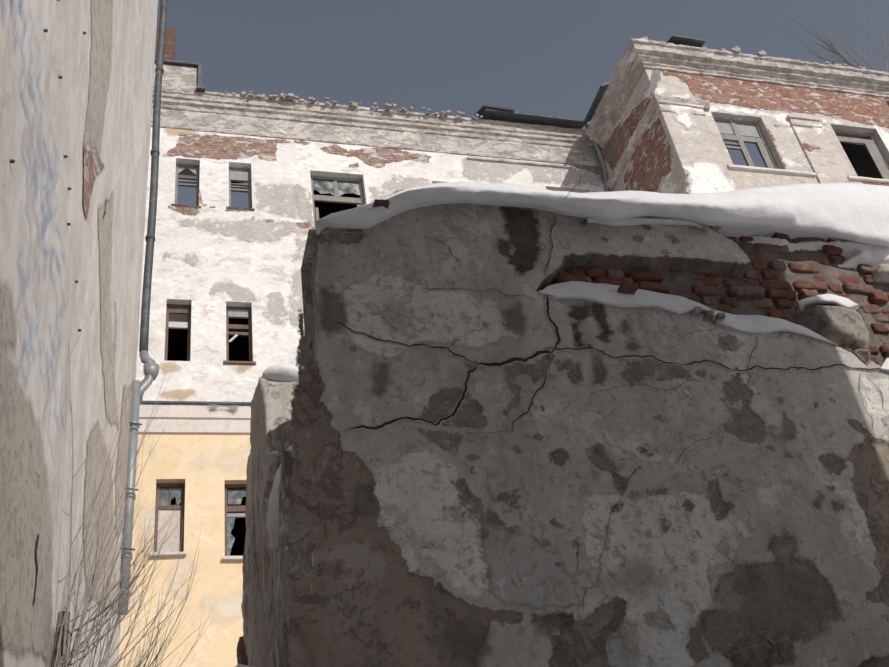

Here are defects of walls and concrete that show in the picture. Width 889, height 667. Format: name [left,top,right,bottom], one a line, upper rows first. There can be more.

spalling [162,133,310,161]
spalling [321,144,431,168]
spalling [463,69,889,194]
crack [542,212,573,274]
flaking render [83,0,133,613]
crack [327,283,888,437]
flaking render [168,183,889,667]
peeling [140,506,155,541]